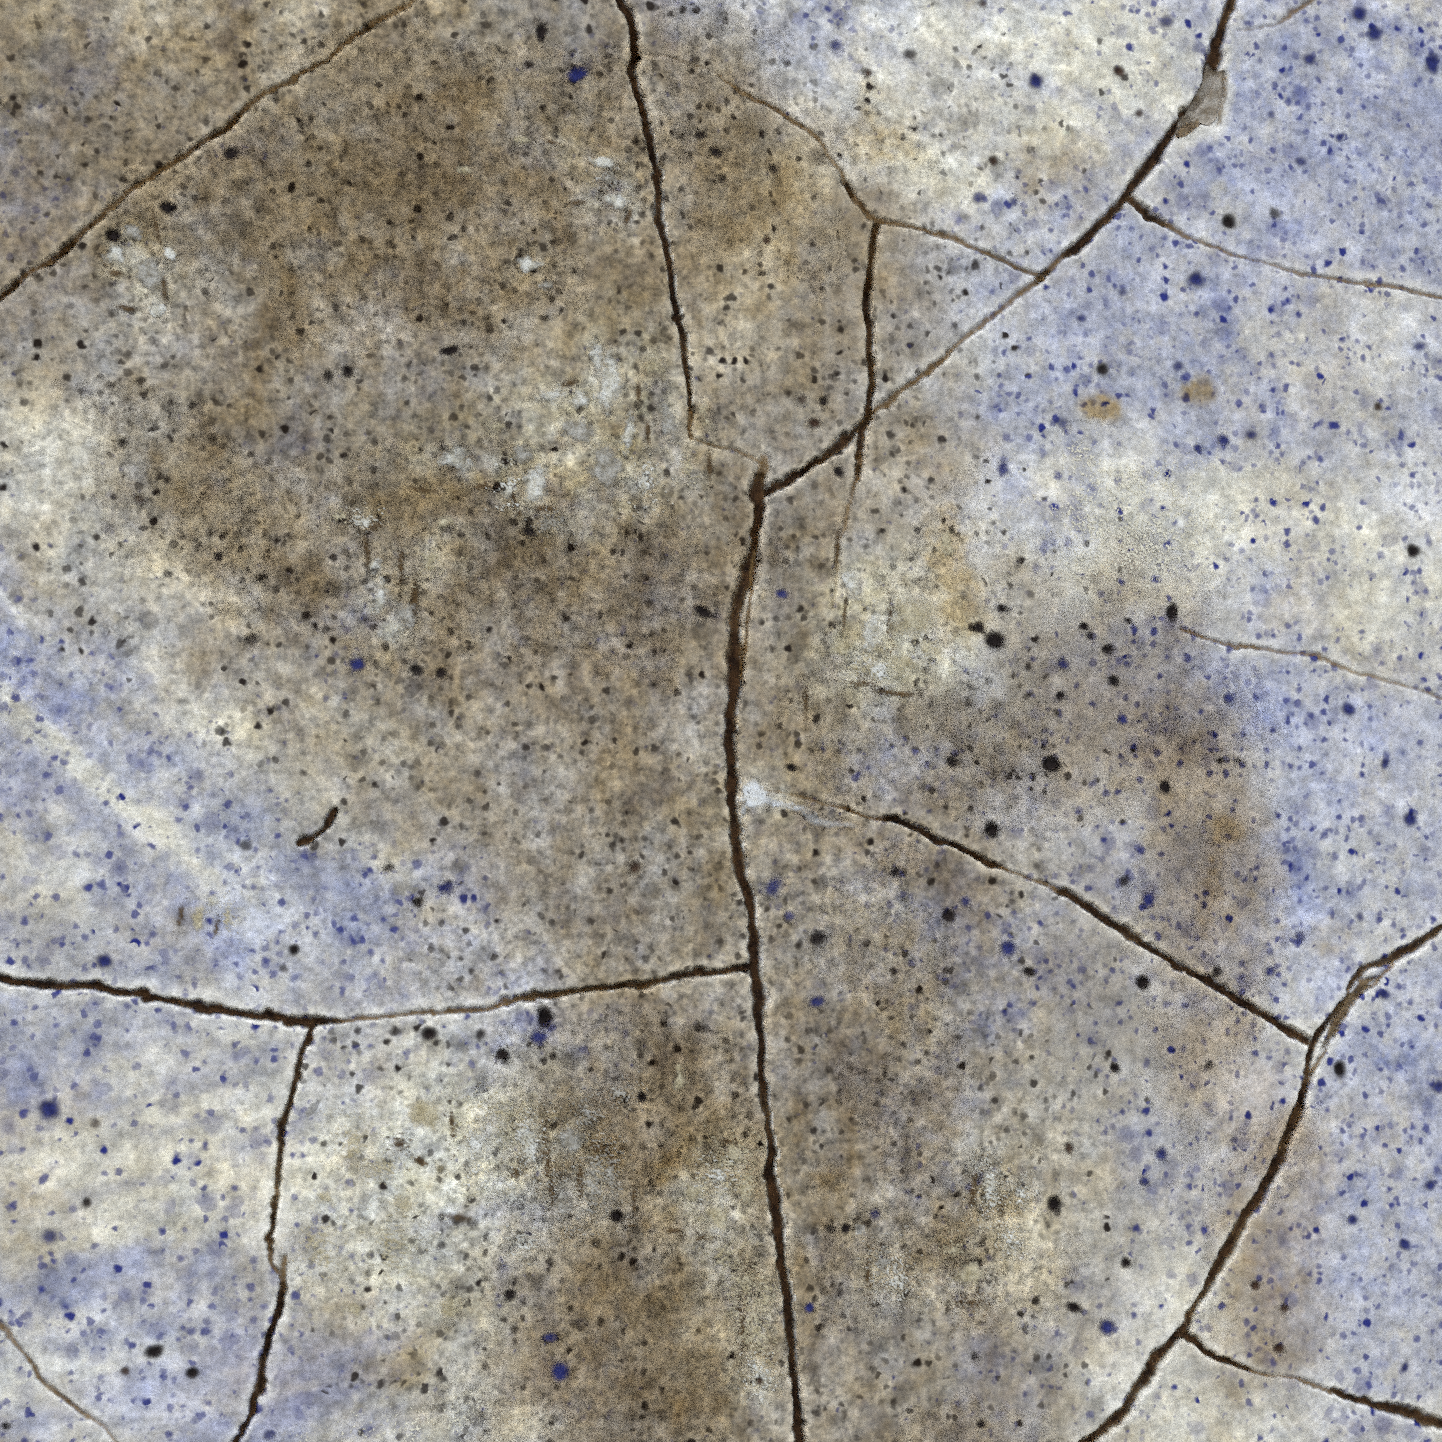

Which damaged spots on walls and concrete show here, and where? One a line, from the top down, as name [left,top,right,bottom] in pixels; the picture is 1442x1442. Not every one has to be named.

crack [0,1,413,300]
crack [616,0,741,453]
crack [1282,0,1313,21]
crack [1272,265,1442,299]
crack [724,0,1235,1442]
crack [1182,630,1430,694]
crack [0,964,752,1442]
crack [779,790,1442,1442]